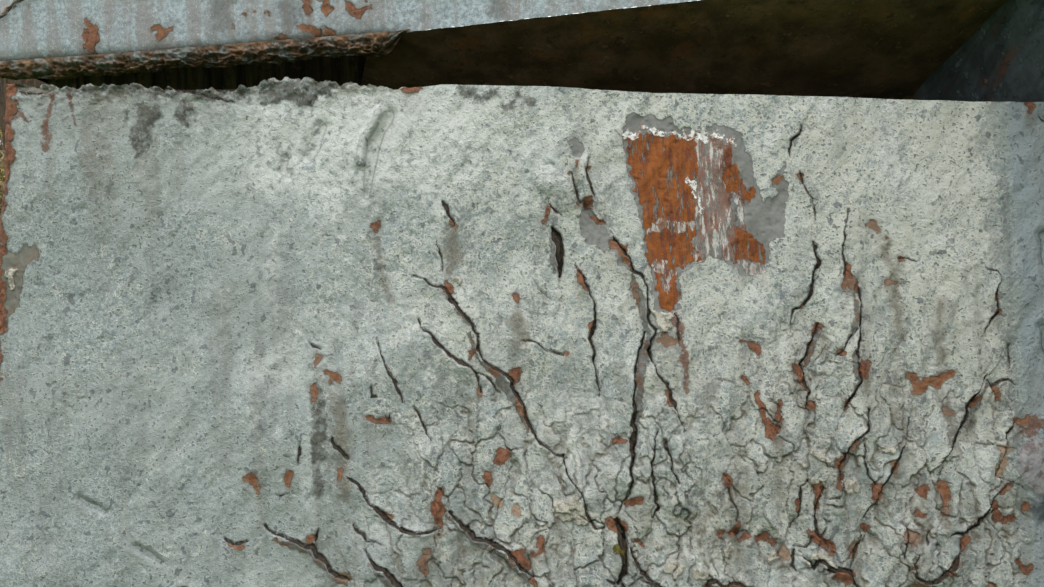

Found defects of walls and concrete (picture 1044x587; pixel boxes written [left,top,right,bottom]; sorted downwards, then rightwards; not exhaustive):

rust [0,0,410,334]
crack [224,438,554,587]
crack [365,342,431,440]
crack [414,201,685,587]
crack [522,159,600,395]
peeling [576,202,632,272]
peeling [622,112,789,333]
crack [702,579,746,587]
crack [717,472,752,543]
crack [772,126,909,587]
crack [903,344,1023,587]
crack [984,269,1002,333]